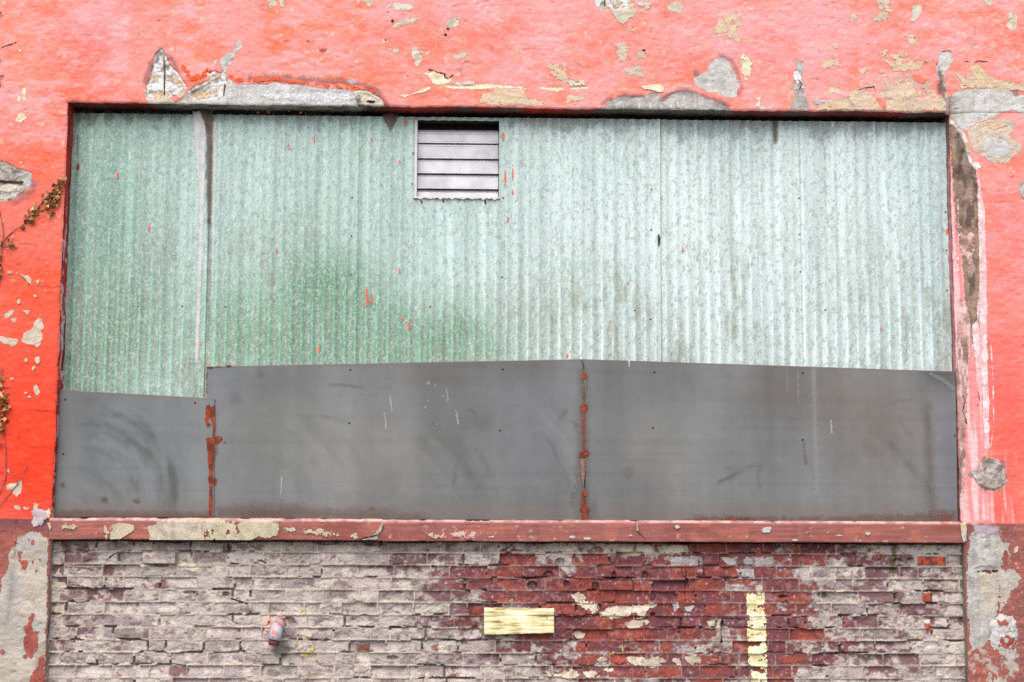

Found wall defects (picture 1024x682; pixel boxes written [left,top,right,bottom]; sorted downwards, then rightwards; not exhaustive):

peeling [144,40,388,107]
peeling [383,0,752,111]
spalling [0,162,35,203]
peeling [0,299,44,370]
spalling [791,32,1024,651]
rust [205,365,231,518]
rust [571,359,590,520]
peeling [147,519,359,540]
peeling [0,469,78,682]
peeling [569,592,657,629]
peeling [722,556,774,579]
peeling [546,647,701,679]